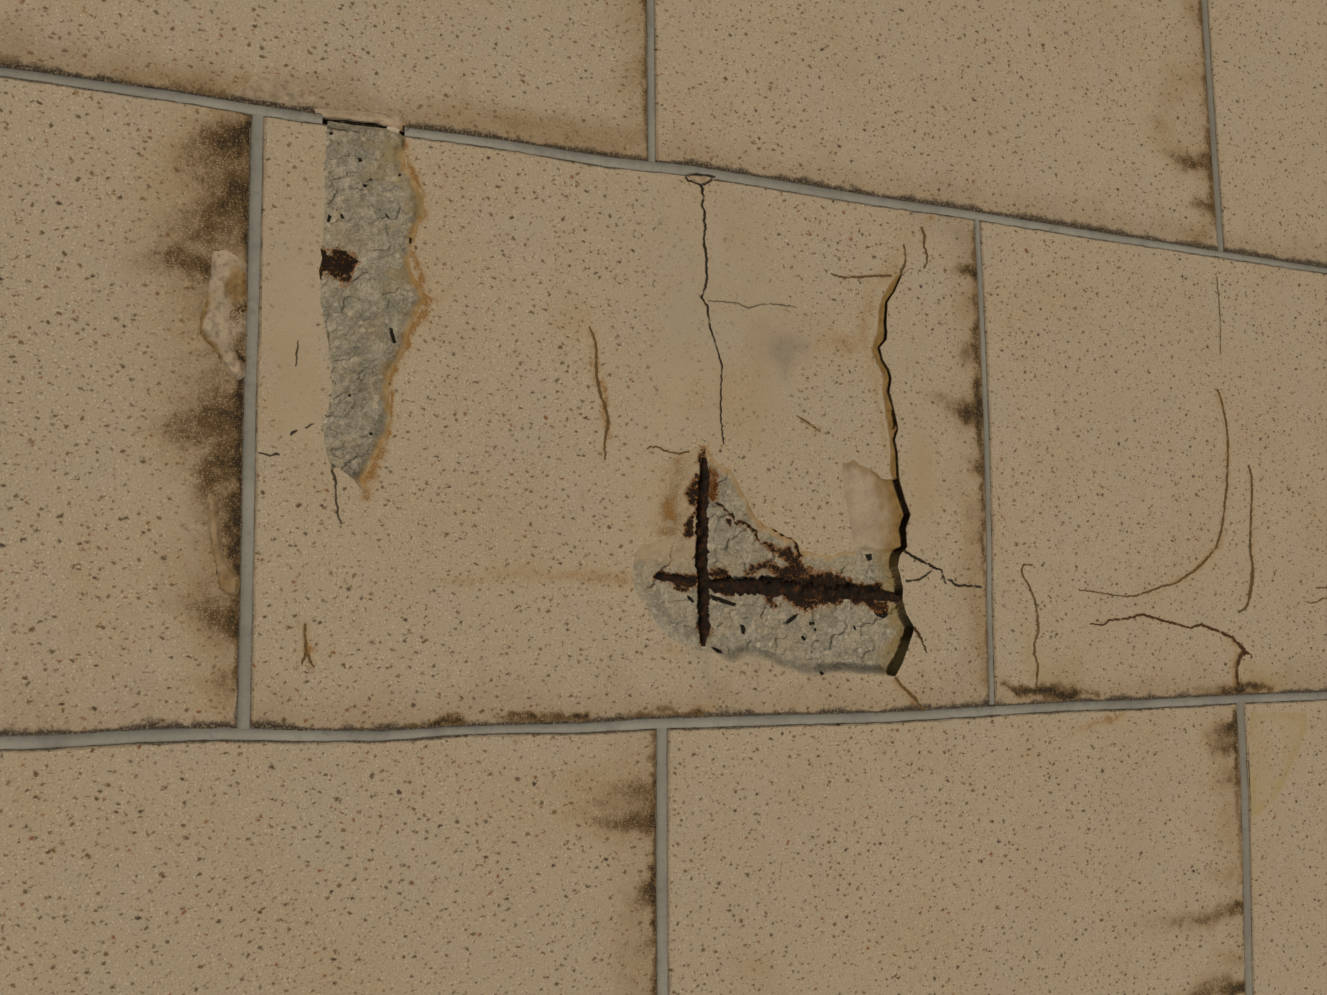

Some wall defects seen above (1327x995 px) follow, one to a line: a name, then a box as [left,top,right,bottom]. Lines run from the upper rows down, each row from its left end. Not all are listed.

water stain [90,51,259,725]
spalling [206,493,241,597]
spalling [199,250,249,380]
spalling [237,74,457,510]
crack [540,284,690,466]
crack [685,173,724,444]
spalling [632,445,914,676]
crack [826,227,929,479]
crack [890,627,931,712]
crack [1021,564,1040,688]
crack [1079,277,1260,693]
water stain [1122,704,1309,995]